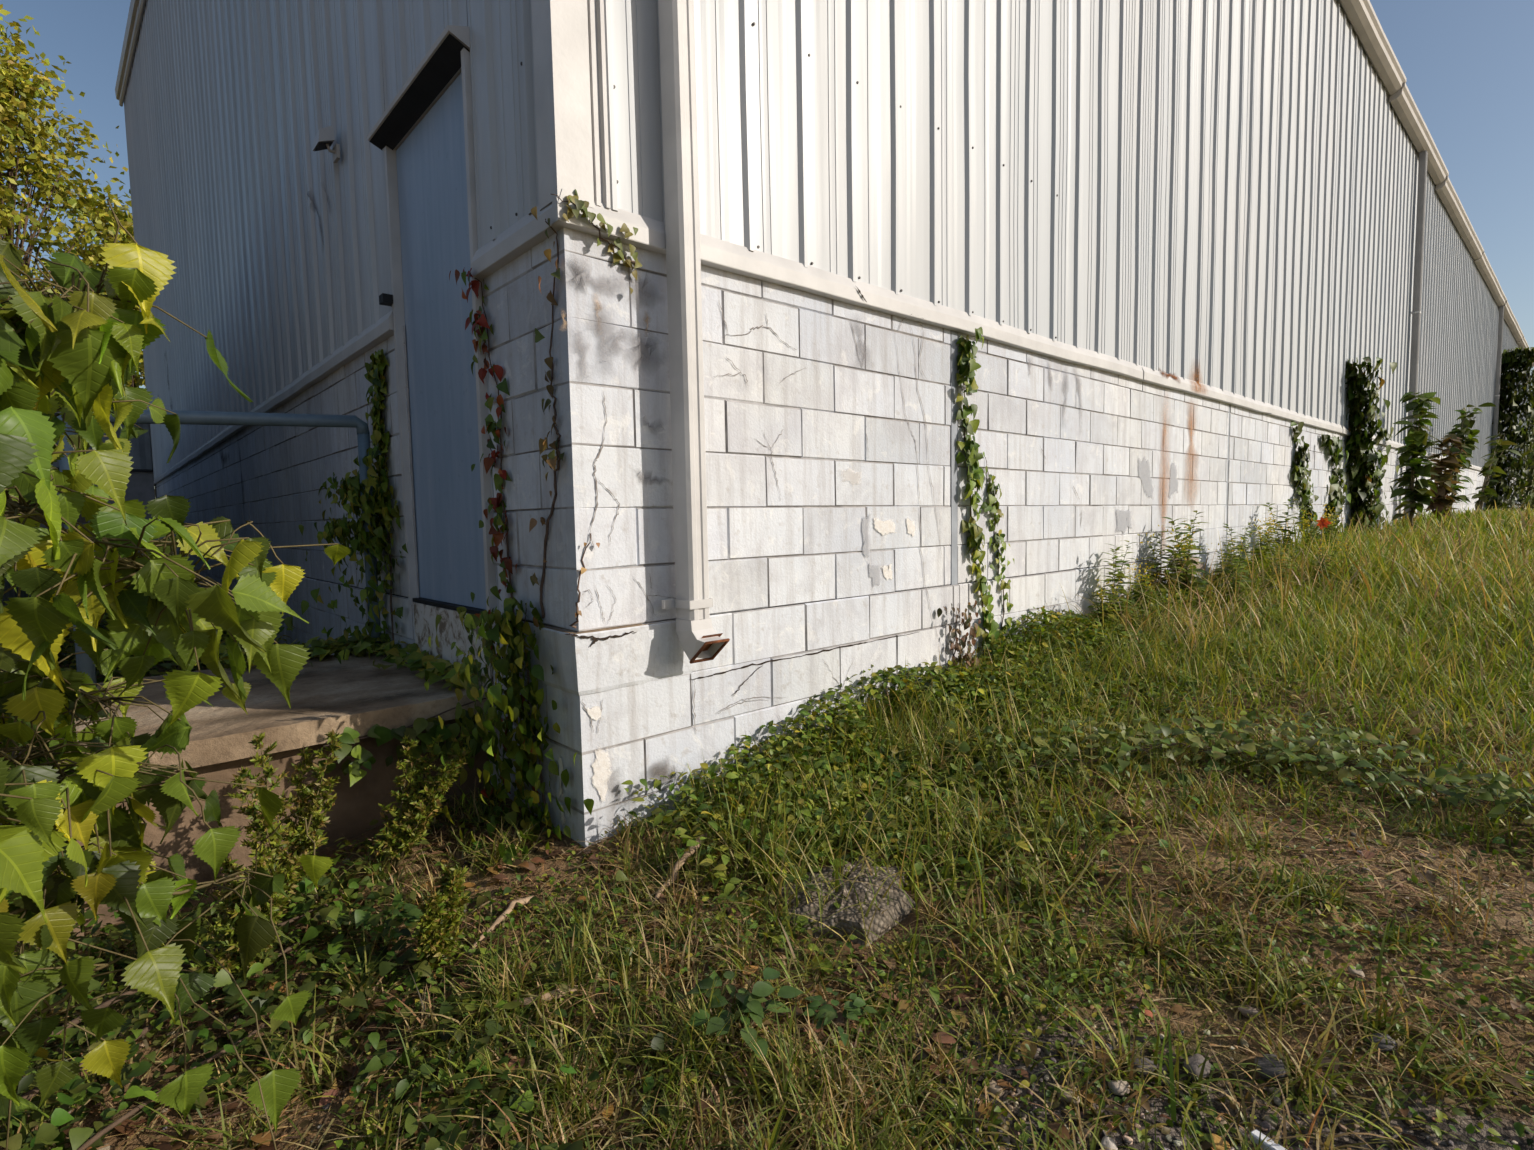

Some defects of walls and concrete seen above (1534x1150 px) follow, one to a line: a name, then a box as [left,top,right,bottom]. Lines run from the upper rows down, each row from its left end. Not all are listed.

water stain [576,269,652,361]
crack [719,303,807,383]
crack [590,394,620,545]
peeling [862,515,915,586]
crack [691,632,917,734]
peeling [592,749,612,801]